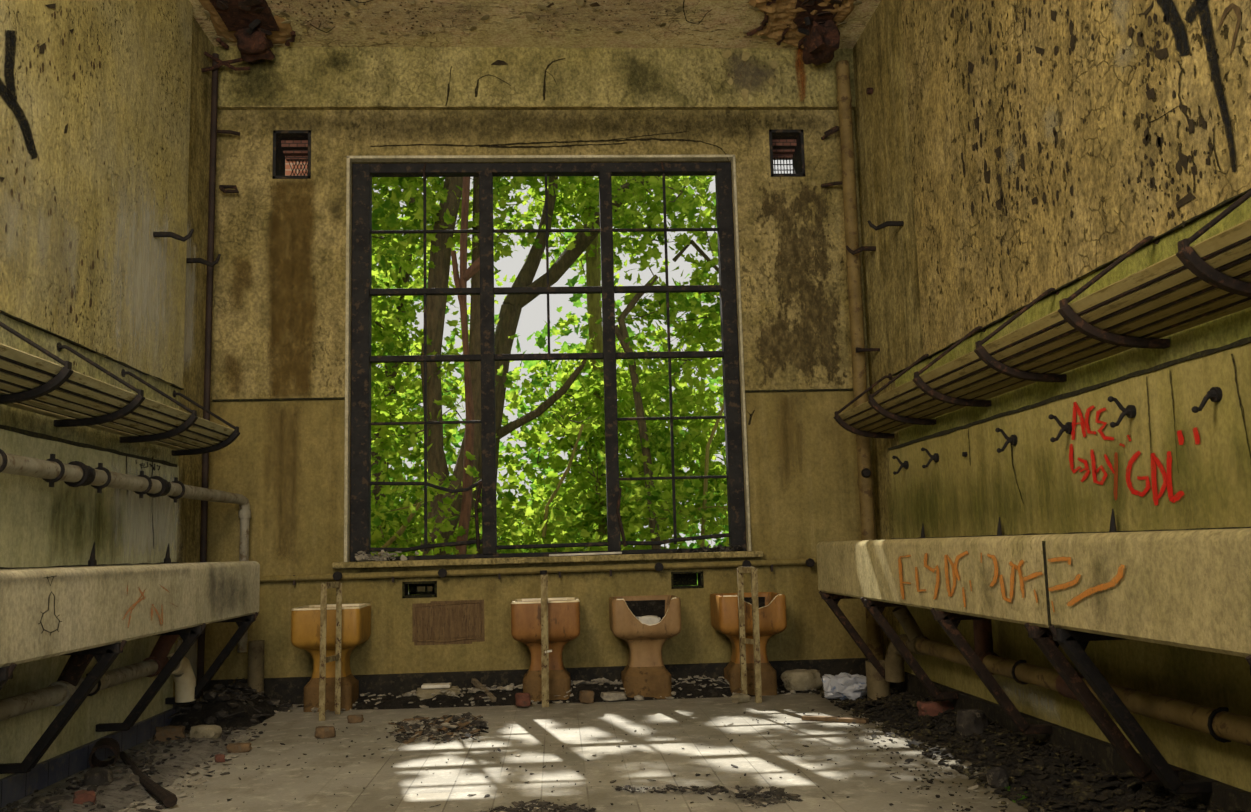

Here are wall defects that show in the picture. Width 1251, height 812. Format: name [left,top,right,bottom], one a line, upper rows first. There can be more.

spalling [199,0,250,72]
spalling [266,0,490,46]
spalling [743,0,862,49]
leakage [269,181,315,396]